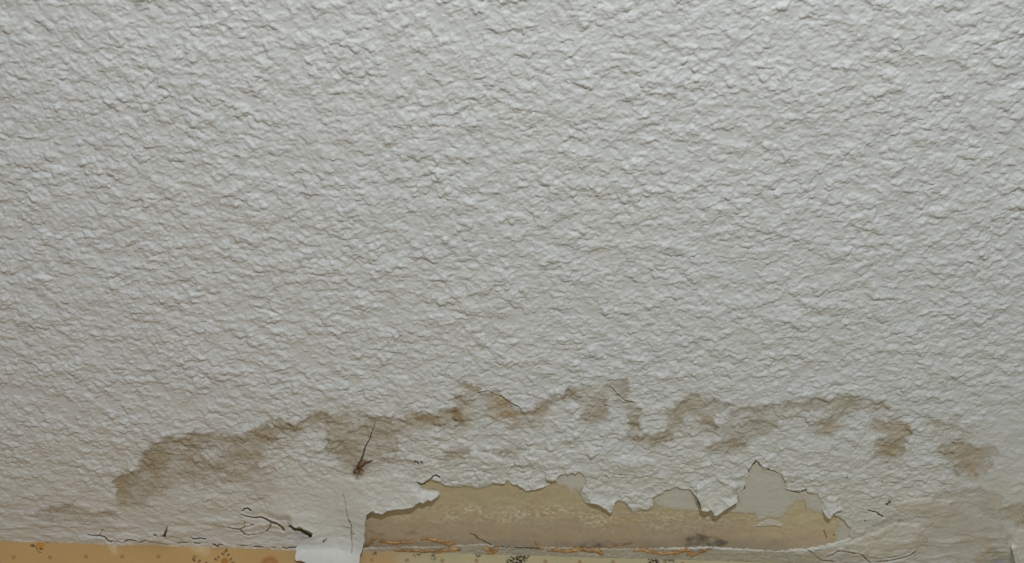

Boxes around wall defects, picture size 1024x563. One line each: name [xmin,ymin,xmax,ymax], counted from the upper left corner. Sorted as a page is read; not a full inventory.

crack [356,423,375,475]
crack [91,495,354,553]
peeling [256,462,850,563]